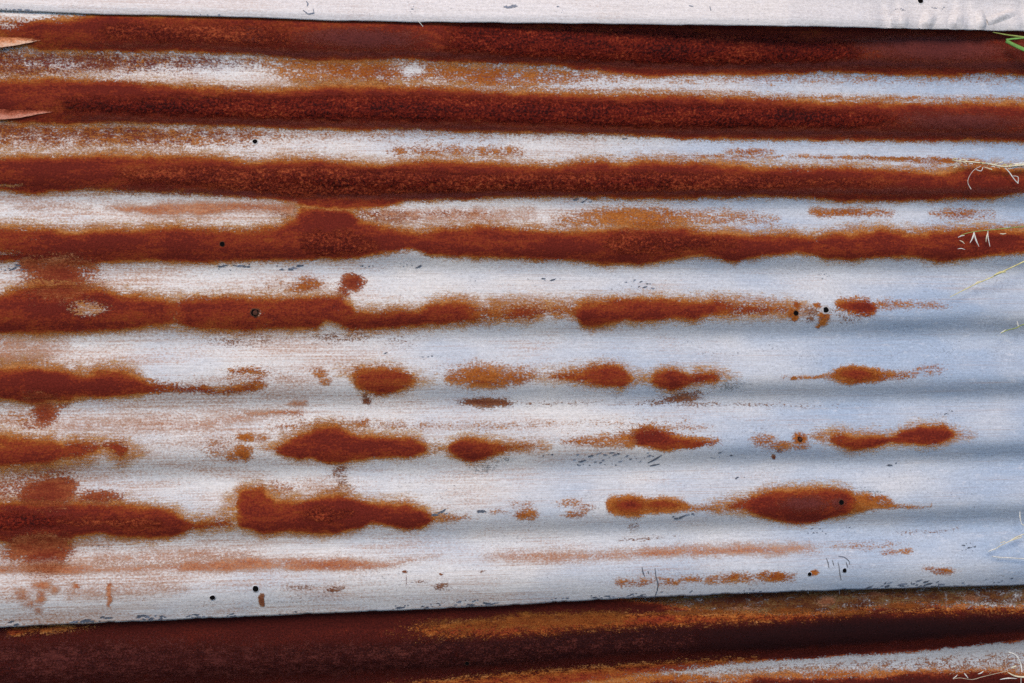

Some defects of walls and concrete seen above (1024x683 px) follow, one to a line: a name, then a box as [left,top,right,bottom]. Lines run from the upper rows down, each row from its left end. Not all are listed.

corrosion [0,13,1024,431]
corrosion [0,416,552,578]
corrosion [561,418,719,453]
corrosion [480,480,925,573]
corrosion [752,420,975,459]
corrosion [0,567,1024,683]